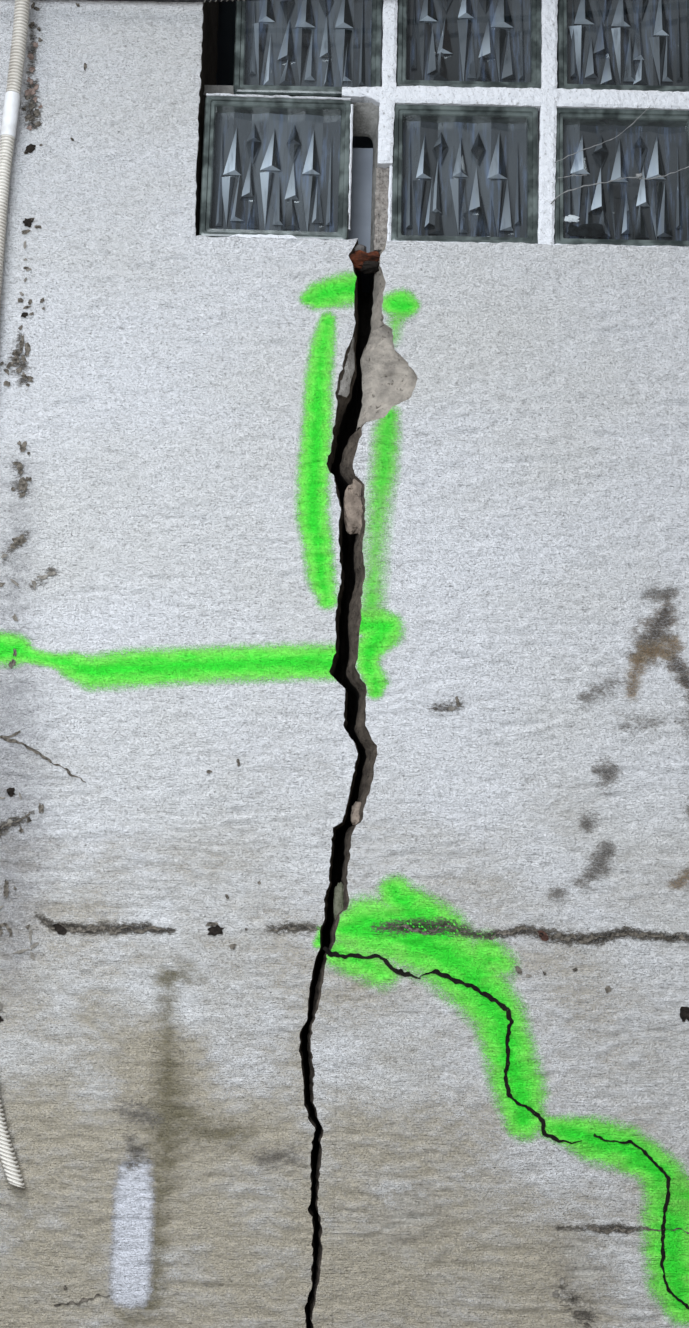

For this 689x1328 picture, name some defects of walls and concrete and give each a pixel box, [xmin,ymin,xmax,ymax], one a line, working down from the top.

rust [349,244,380,274]
spalling [356,324,417,431]
crack [267,241,689,1328]
crack [35,912,236,949]
crack [54,1294,110,1307]